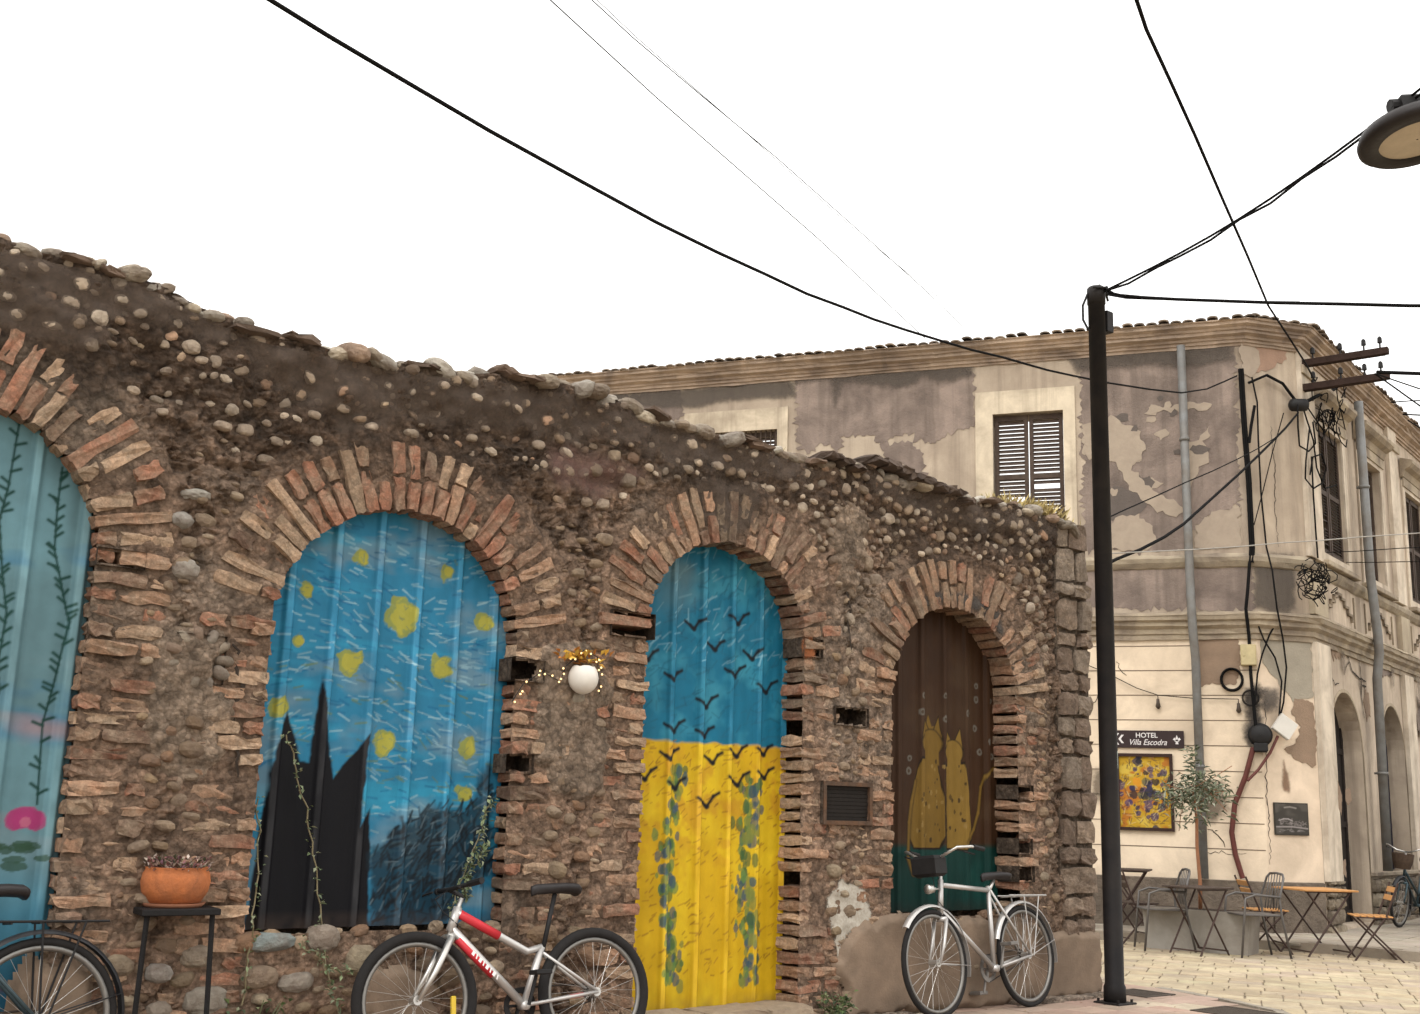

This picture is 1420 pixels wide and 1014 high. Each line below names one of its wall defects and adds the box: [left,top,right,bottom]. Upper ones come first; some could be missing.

peeling [634,390,685,421]
peeling [793,371,977,476]
peeling [1077,368,1095,607]
peeling [1107,342,1287,611]